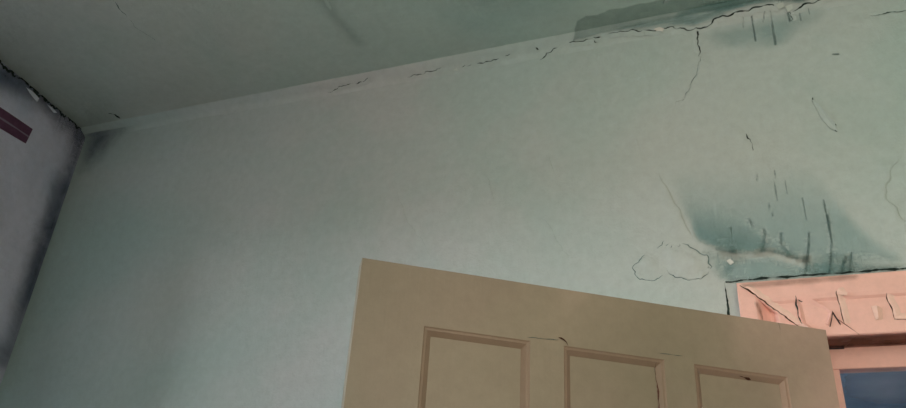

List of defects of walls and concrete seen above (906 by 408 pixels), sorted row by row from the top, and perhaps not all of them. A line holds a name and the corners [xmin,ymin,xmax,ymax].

crack [725,268,906,326]
peeling [794,287,857,349]